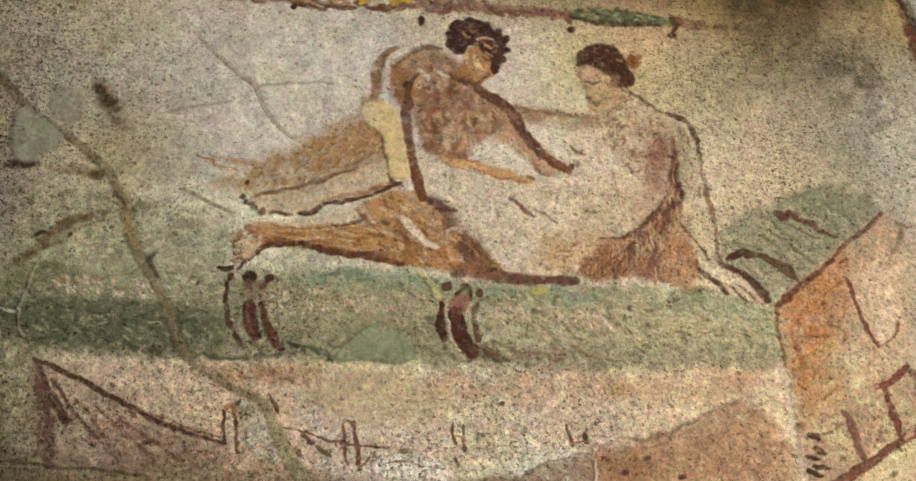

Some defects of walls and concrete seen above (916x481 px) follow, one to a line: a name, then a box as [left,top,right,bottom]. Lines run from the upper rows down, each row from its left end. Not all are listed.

crack [0,73,313,481]
crack [198,33,326,139]